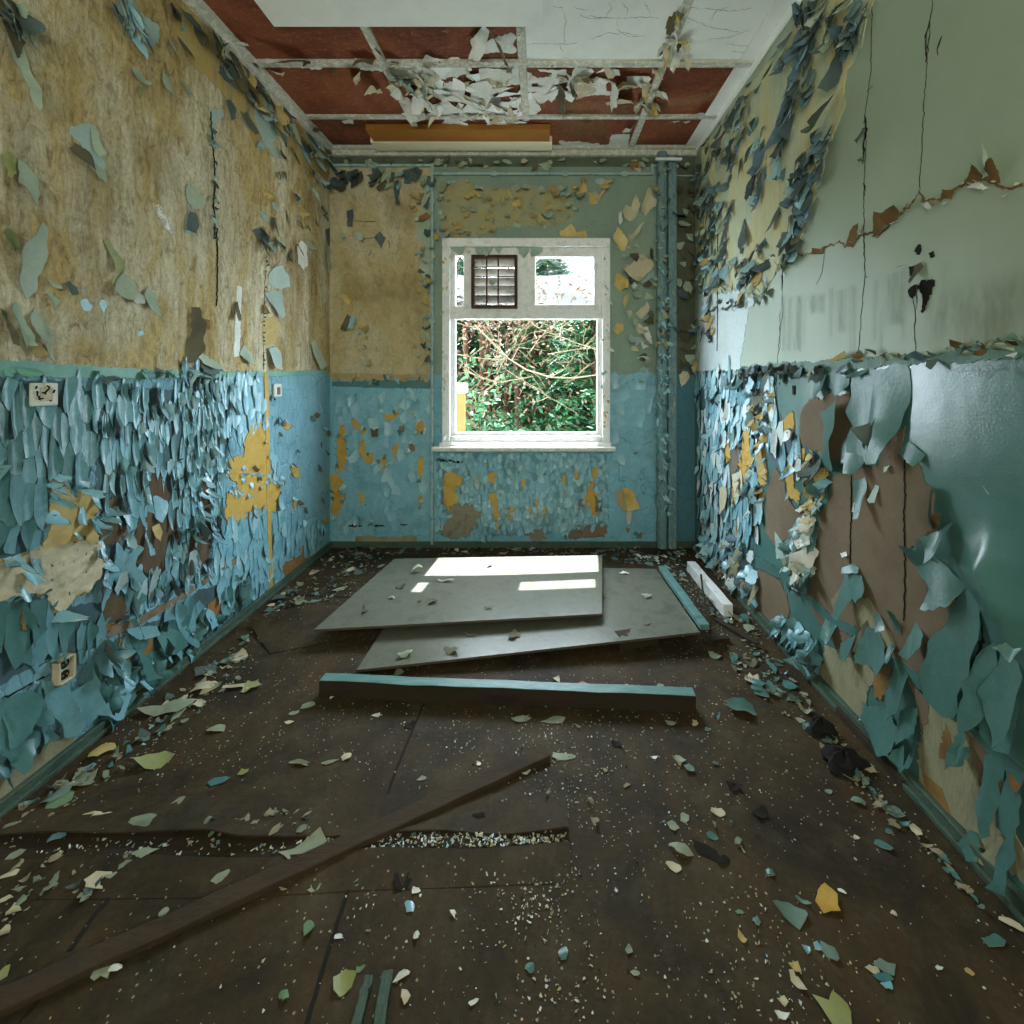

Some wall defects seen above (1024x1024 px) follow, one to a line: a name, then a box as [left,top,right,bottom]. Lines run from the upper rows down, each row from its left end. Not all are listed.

crack [209,109,224,306]
peeling [0,0,691,799]
crack [533,3,653,51]
peeling [602,0,1024,896]
crack [687,1,1024,580]